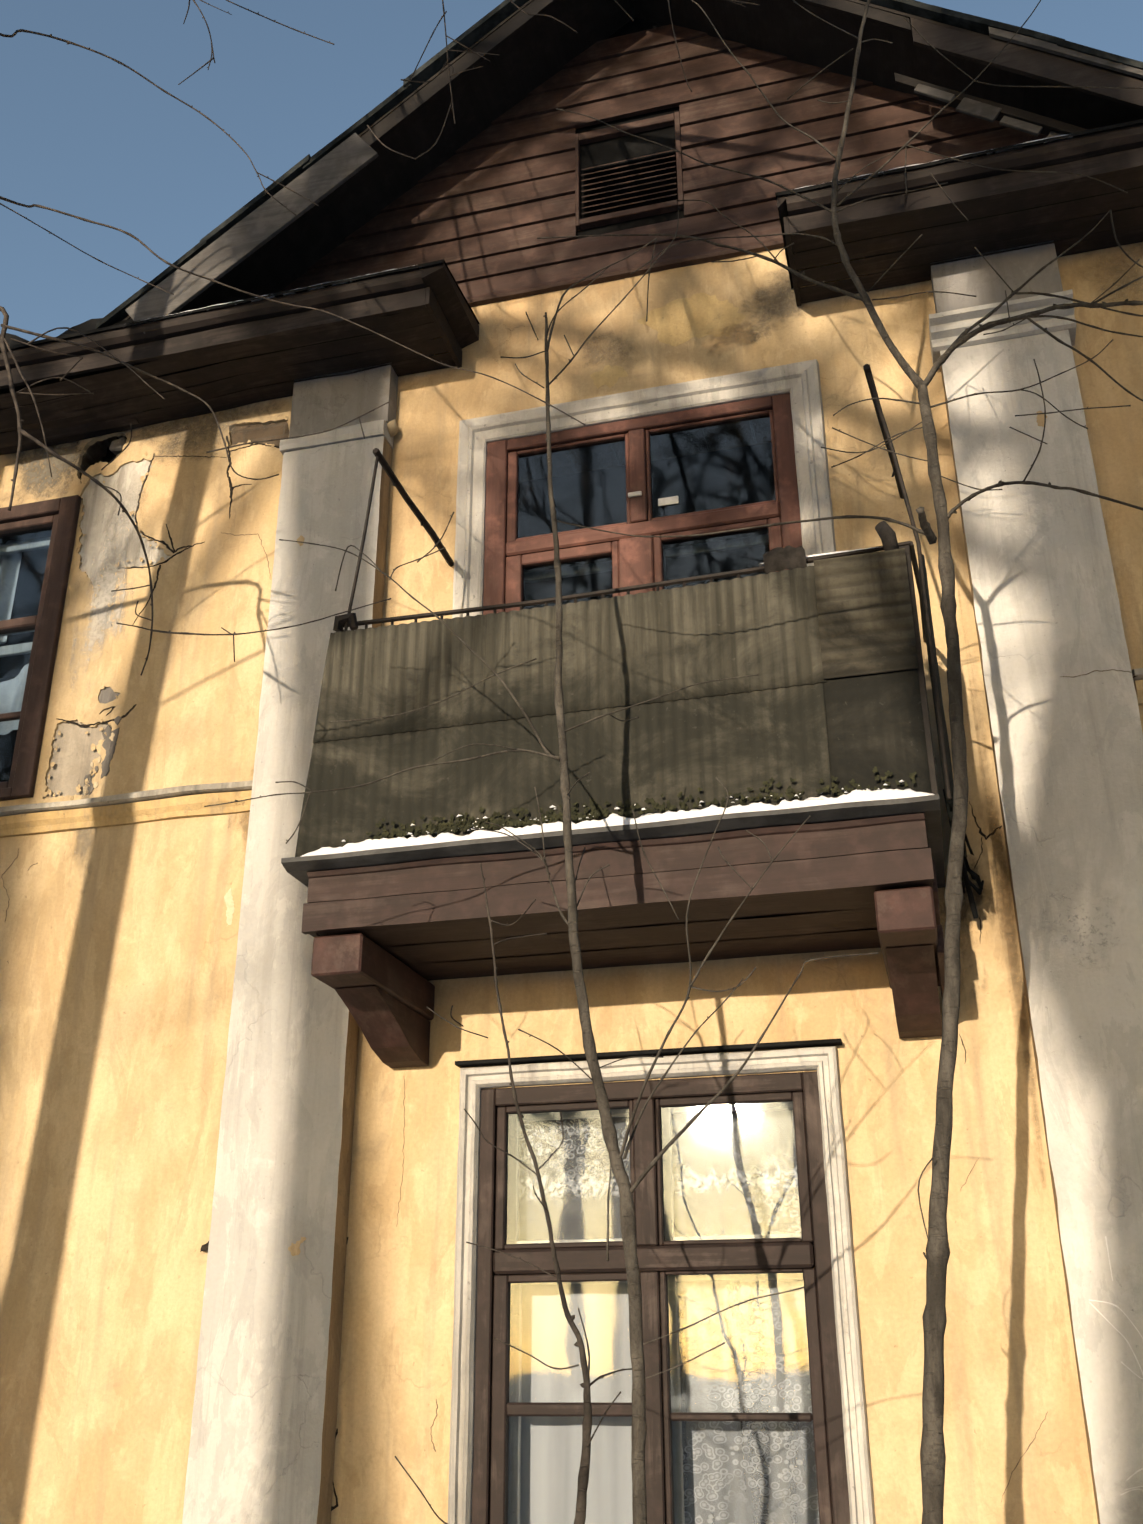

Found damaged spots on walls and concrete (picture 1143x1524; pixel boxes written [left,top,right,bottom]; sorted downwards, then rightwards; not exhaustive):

peeling [76,435,170,629]
crack [118,436,279,624]
spalling [41,685,122,800]